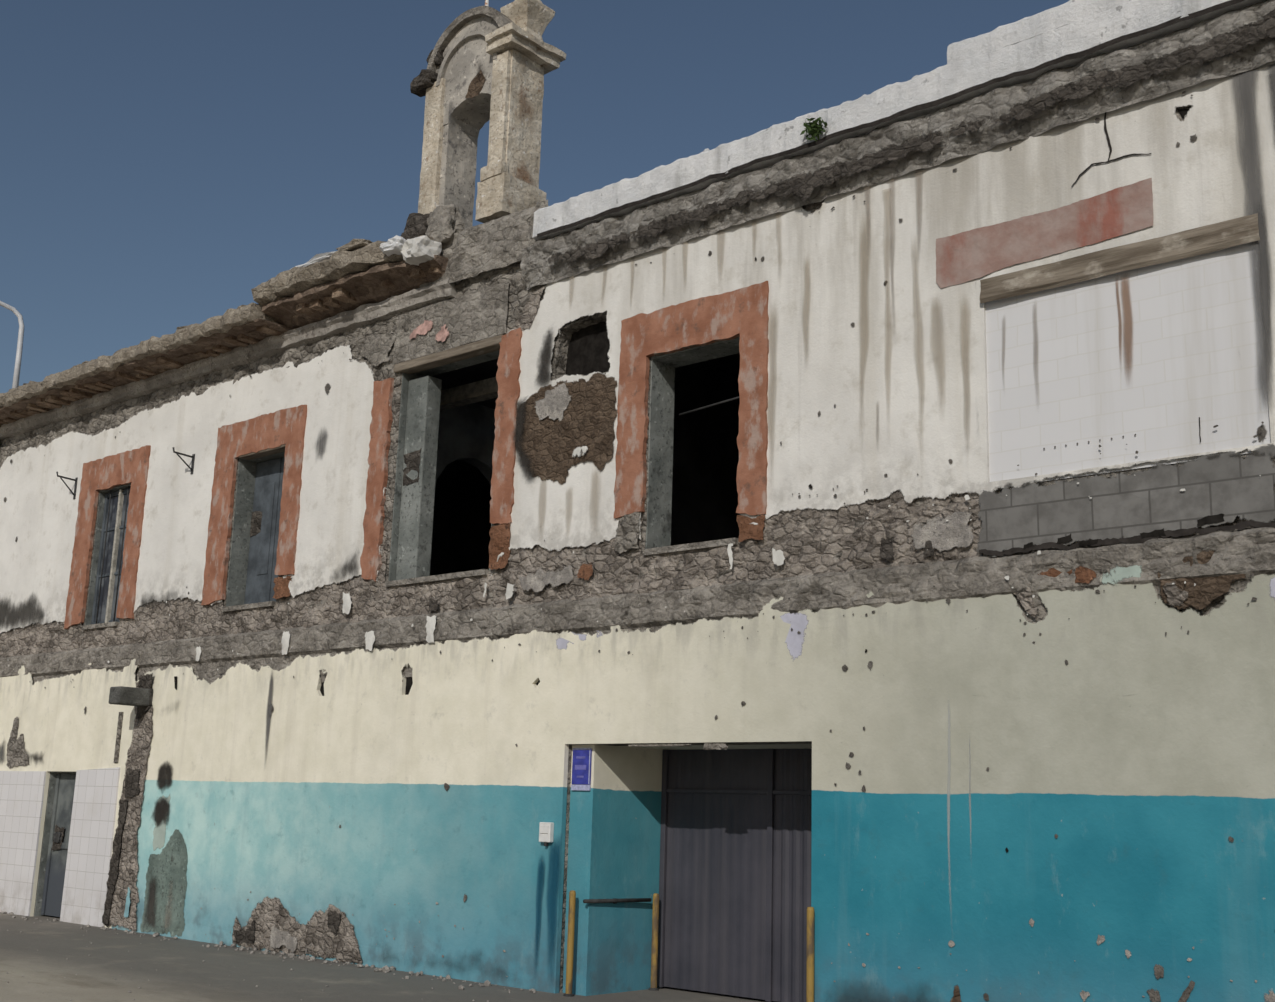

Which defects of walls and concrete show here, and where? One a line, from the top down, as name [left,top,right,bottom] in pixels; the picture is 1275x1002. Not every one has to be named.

crack [537,0,1245,238]
spalling [546,9,1275,264]
damp [1233,63,1275,398]
flaking render [1253,421,1267,442]
damp [0,597,44,628]
flaking render [0,484,982,672]
peeling [1038,565,1142,593]
spalling [1155,550,1254,611]
spalling [405,677,413,695]
spalling [7,717,29,769]
spalling [102,661,195,937]
spalling [230,891,362,964]